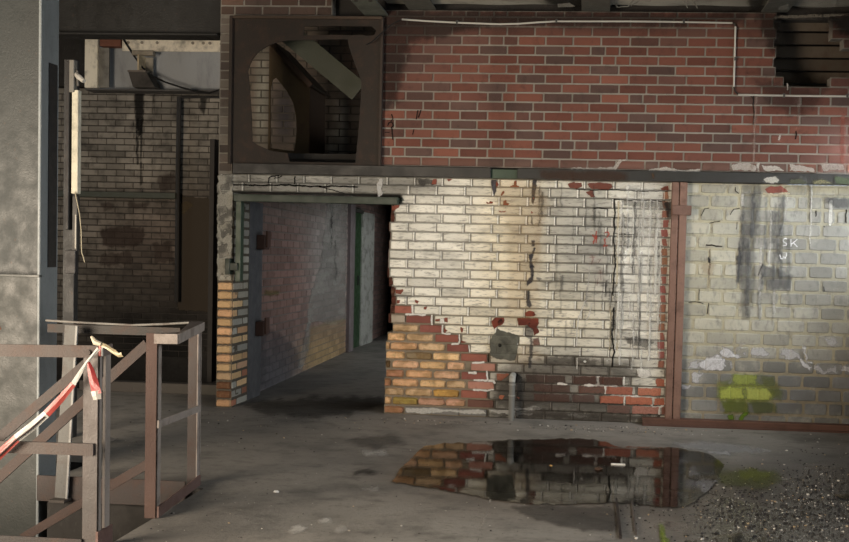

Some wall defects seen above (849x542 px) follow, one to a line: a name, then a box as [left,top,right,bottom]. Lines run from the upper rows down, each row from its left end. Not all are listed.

spalling [384,205,665,417]
leakage [525,325,533,368]
leakage [526,241,535,307]
peeling [568,182,613,197]
leakage [584,376,639,405]
crack [576,189,668,367]
leakage [605,201,662,378]
peeling [657,186,669,368]